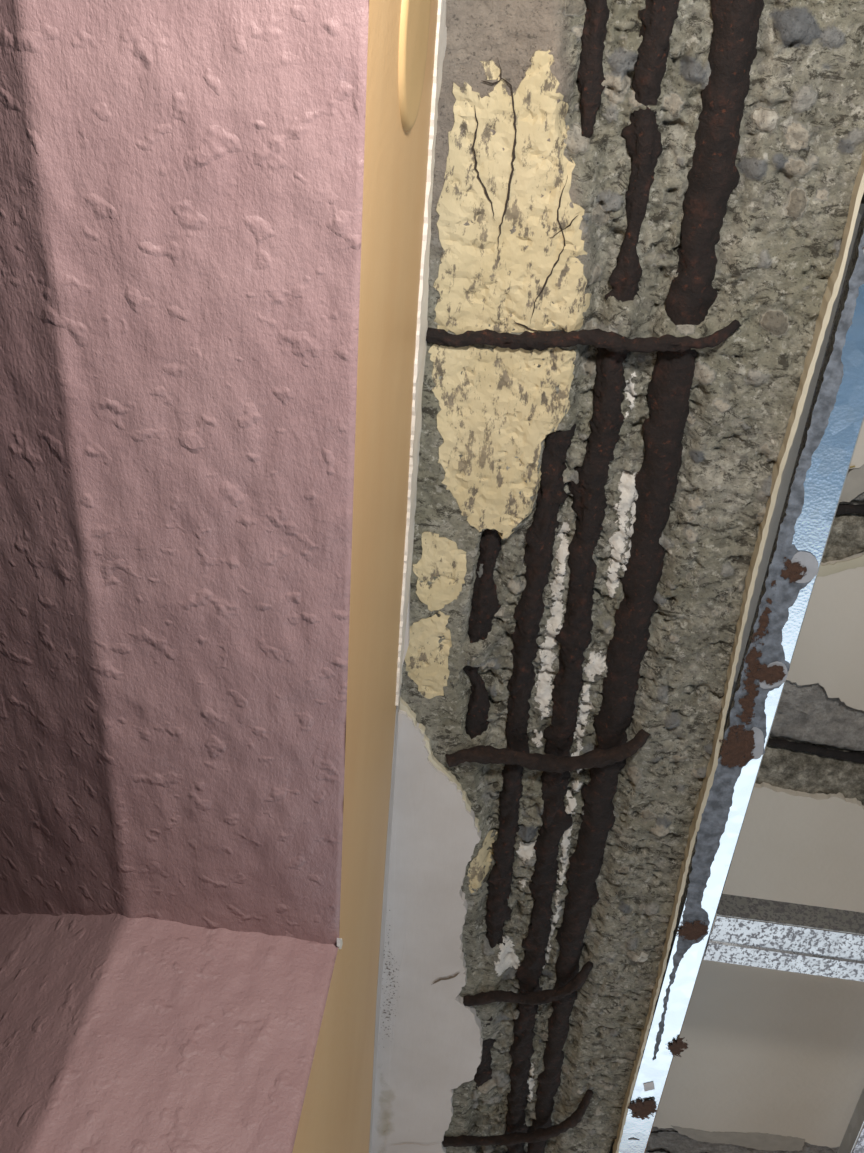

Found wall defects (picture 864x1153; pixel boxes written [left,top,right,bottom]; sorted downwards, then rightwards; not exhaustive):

crack [472,60,517,254]
crack [514,175,578,332]
spalling [399,0,864,1153]
corrosion [719,557,807,768]
corrosion [676,919,708,941]
corrosion [627,1100,658,1120]
corrosion [667,1037,688,1057]